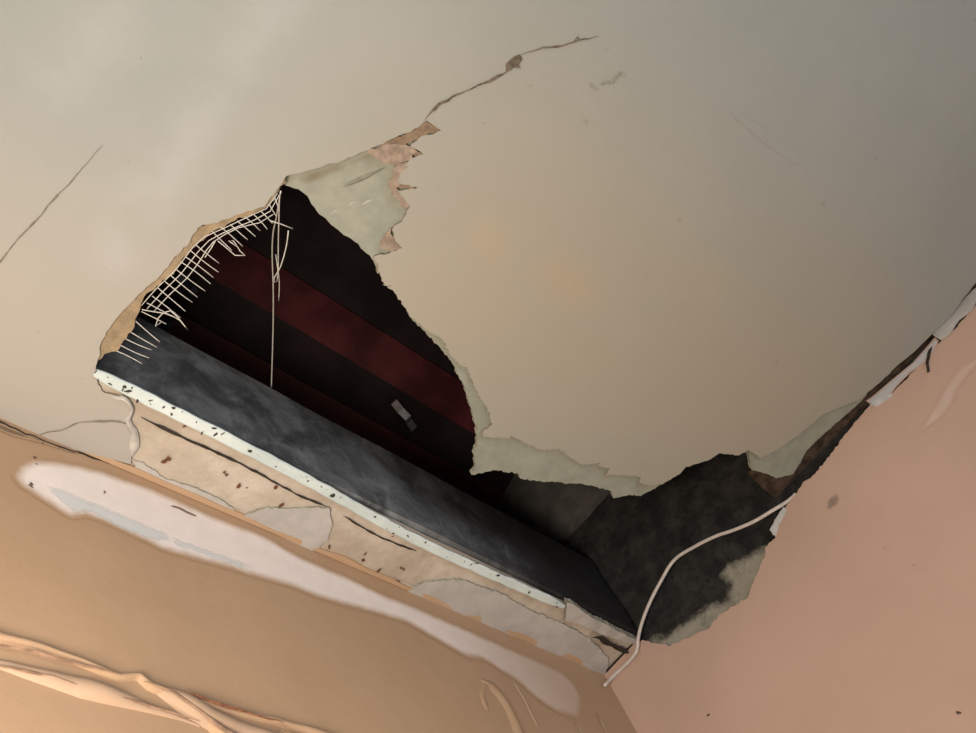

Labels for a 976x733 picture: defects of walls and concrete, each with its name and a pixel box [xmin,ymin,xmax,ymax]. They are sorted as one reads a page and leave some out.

crack [424,36,598,122]
crack [0,146,102,263]
peeling [81,380,870,675]